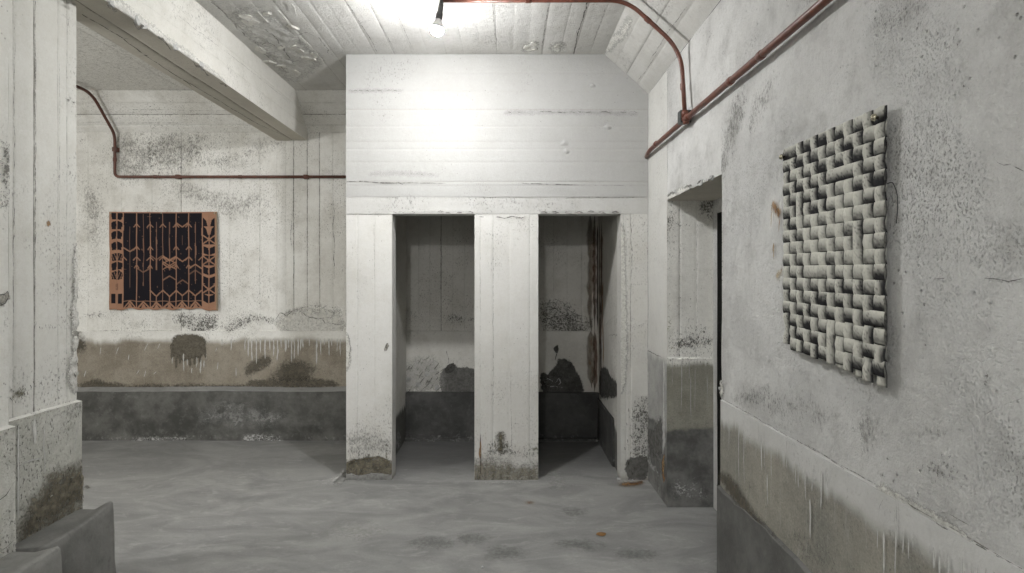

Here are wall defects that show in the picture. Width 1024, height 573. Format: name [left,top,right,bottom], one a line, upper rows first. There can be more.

peeling [211,2,329,81]
rust [587,216,604,392]
leakage [80,311,341,387]
leakage [439,363,474,392]
leakage [540,358,584,392]
leakage [599,367,617,399]
leakage [672,327,713,411]
leakage [18,465,86,541]
leakage [325,433,401,484]
leakage [625,396,665,480]
leakage [719,433,762,525]
leakage [877,506,913,573]